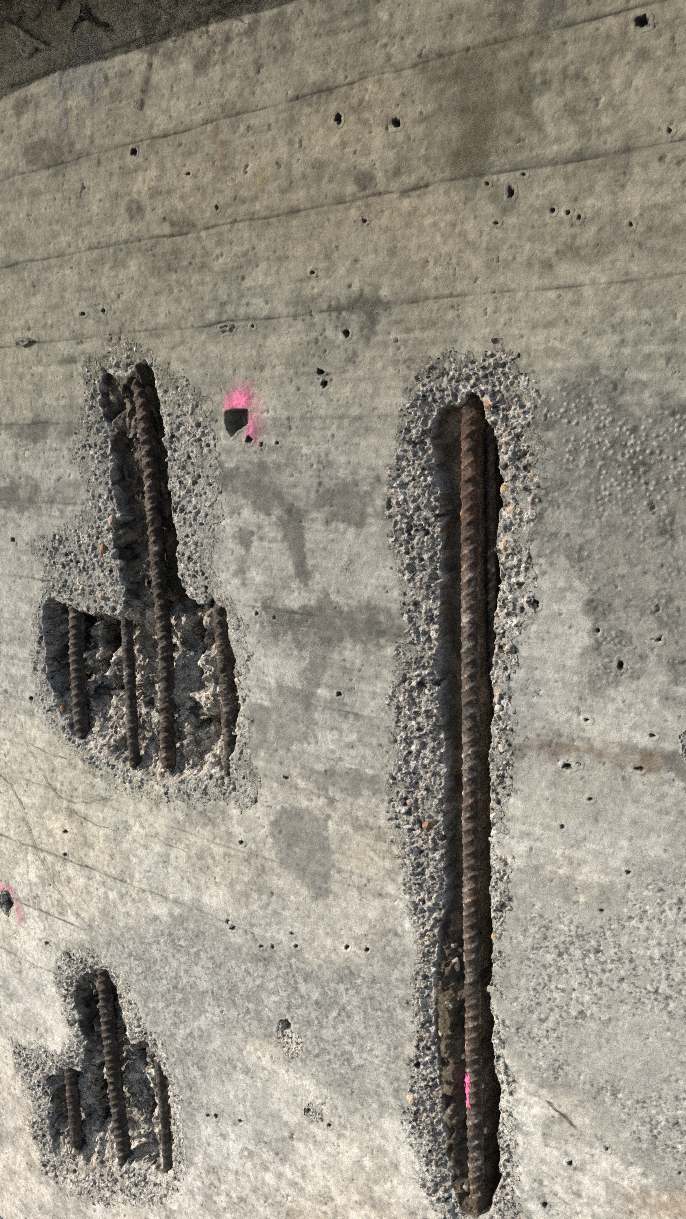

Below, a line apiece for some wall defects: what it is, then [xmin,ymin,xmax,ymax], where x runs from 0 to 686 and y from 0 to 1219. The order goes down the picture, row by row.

spalling [8,331,686,1219]